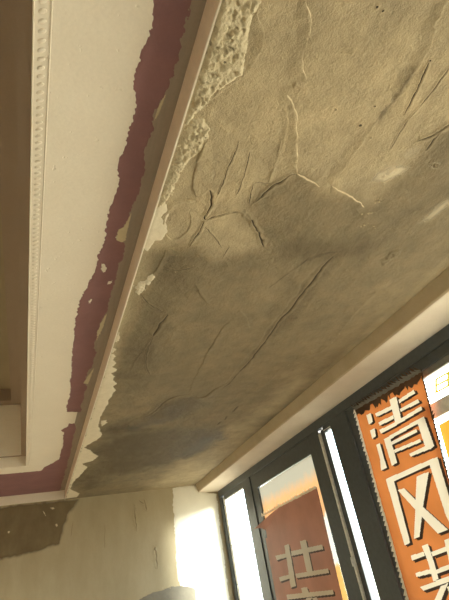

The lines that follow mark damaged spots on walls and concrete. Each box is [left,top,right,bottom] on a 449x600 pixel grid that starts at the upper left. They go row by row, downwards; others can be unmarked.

flaking render [144,0,262,251]
crack [390,61,449,151]
peeling [66,0,192,412]
crack [188,140,297,258]
crack [129,294,172,375]
crack [218,252,337,391]